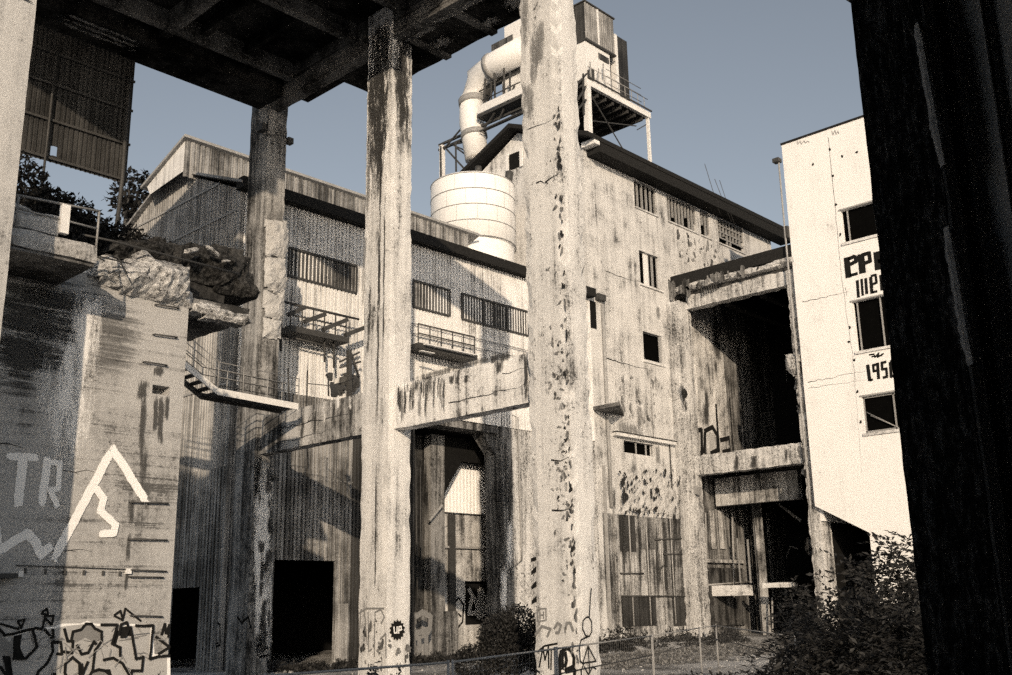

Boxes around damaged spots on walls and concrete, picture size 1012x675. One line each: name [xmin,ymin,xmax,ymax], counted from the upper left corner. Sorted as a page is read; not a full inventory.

leakage [505,0,544,118]
spalling [87,250,252,329]
leakage [0,283,130,455]
leakage [300,387,354,437]
leakage [397,353,509,418]
leakage [619,407,641,434]
leakage [250,457,278,655]